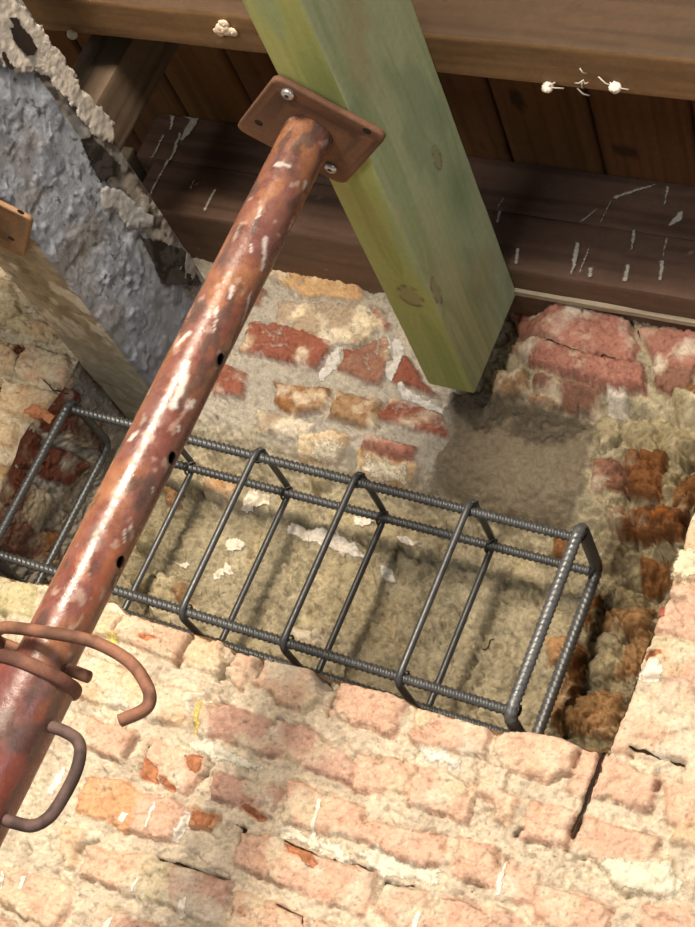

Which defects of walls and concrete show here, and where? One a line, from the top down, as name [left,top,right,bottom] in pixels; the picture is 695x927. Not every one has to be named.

peeling [0,0,201,286]
spalling [25,405,55,424]
crack [571,752,606,833]
crack [629,745,685,767]